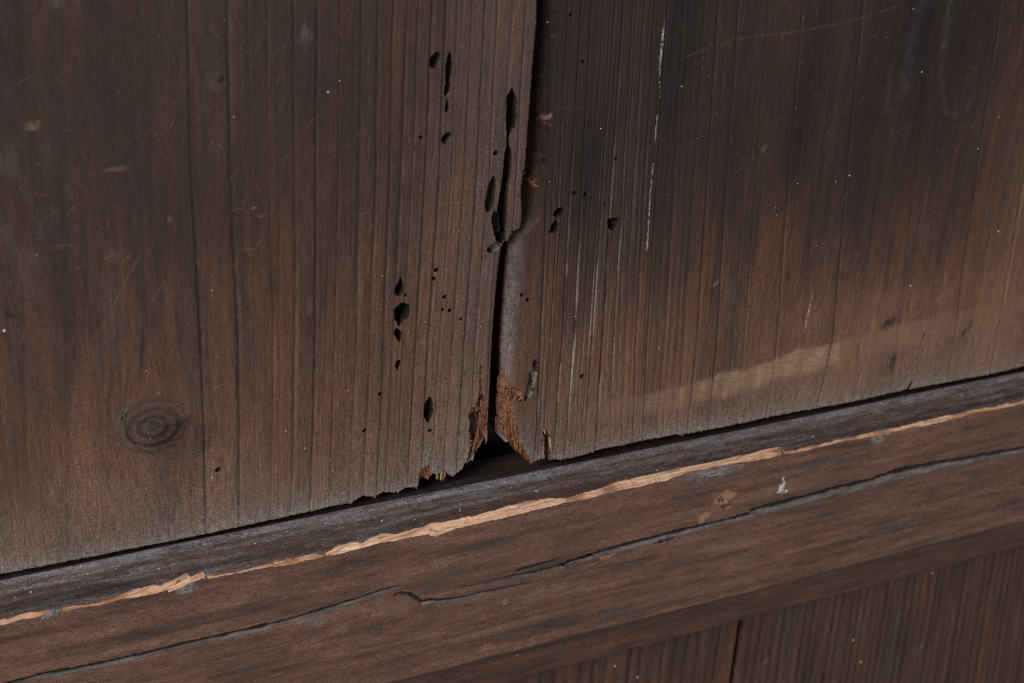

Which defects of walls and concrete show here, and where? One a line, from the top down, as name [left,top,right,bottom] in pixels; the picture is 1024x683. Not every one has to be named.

peeling [472,376,530,461]
hole [524,359,538,401]
peeling [419,465,446,481]
crack [6,447,1024,683]